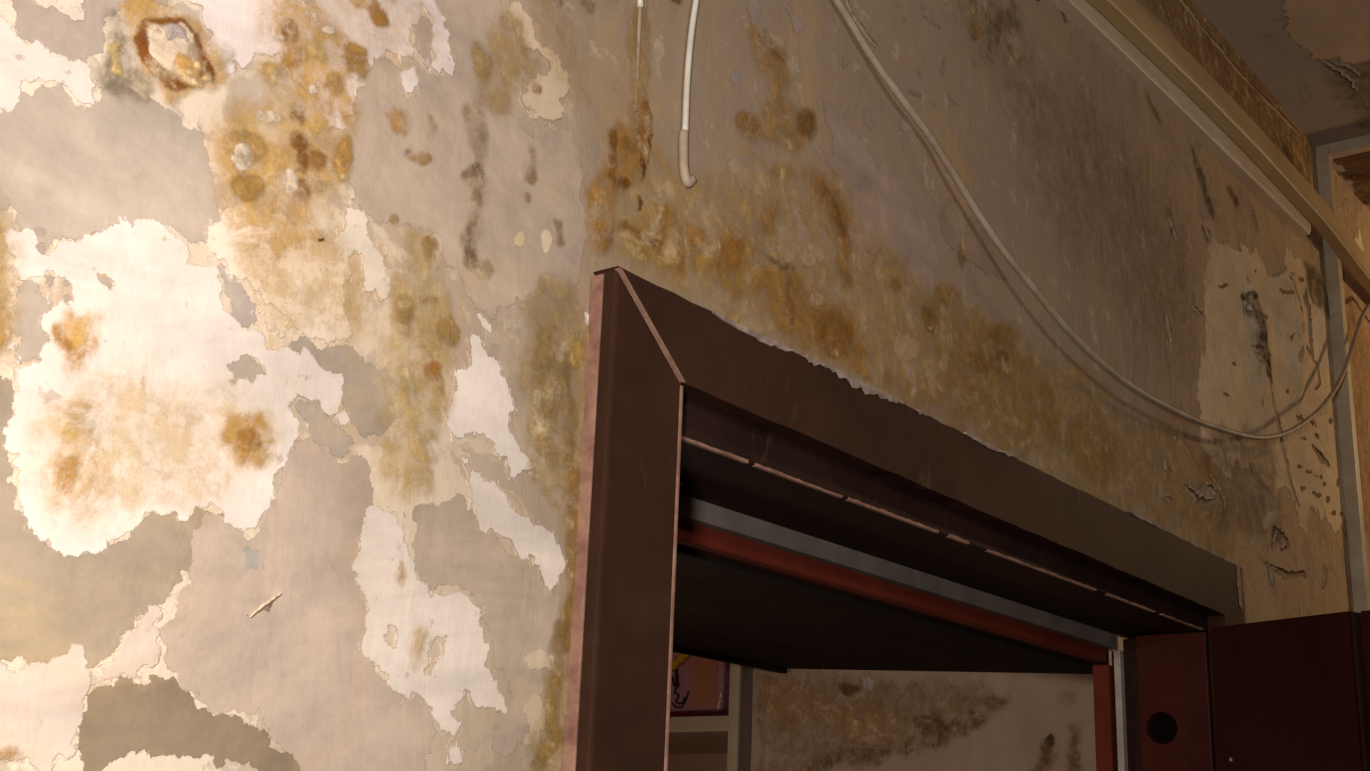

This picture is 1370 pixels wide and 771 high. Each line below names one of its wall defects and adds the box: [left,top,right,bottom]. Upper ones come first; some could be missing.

peeling [1279,0,1370,66]
peeling [0,0,588,771]
water stain [522,275,589,771]
water stain [756,669,1003,771]
water stain [621,146,1275,553]
flaking render [1297,464,1343,516]